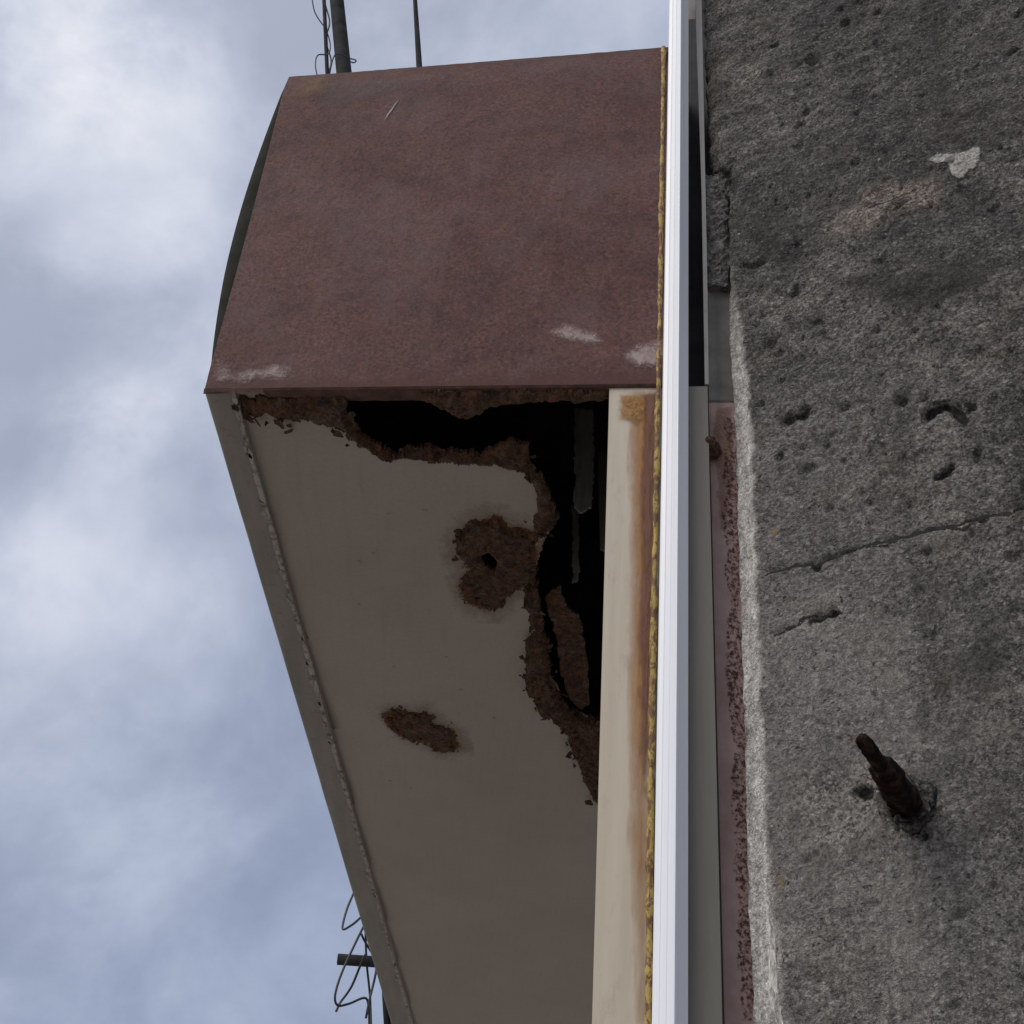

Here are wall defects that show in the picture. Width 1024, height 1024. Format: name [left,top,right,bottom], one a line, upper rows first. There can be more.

corrosion [231,393,600,806]
corrosion [419,388,608,419]
corrosion [621,393,656,880]
corrosion [715,408,754,1020]
crack [773,610,842,636]
crack [765,506,1024,576]